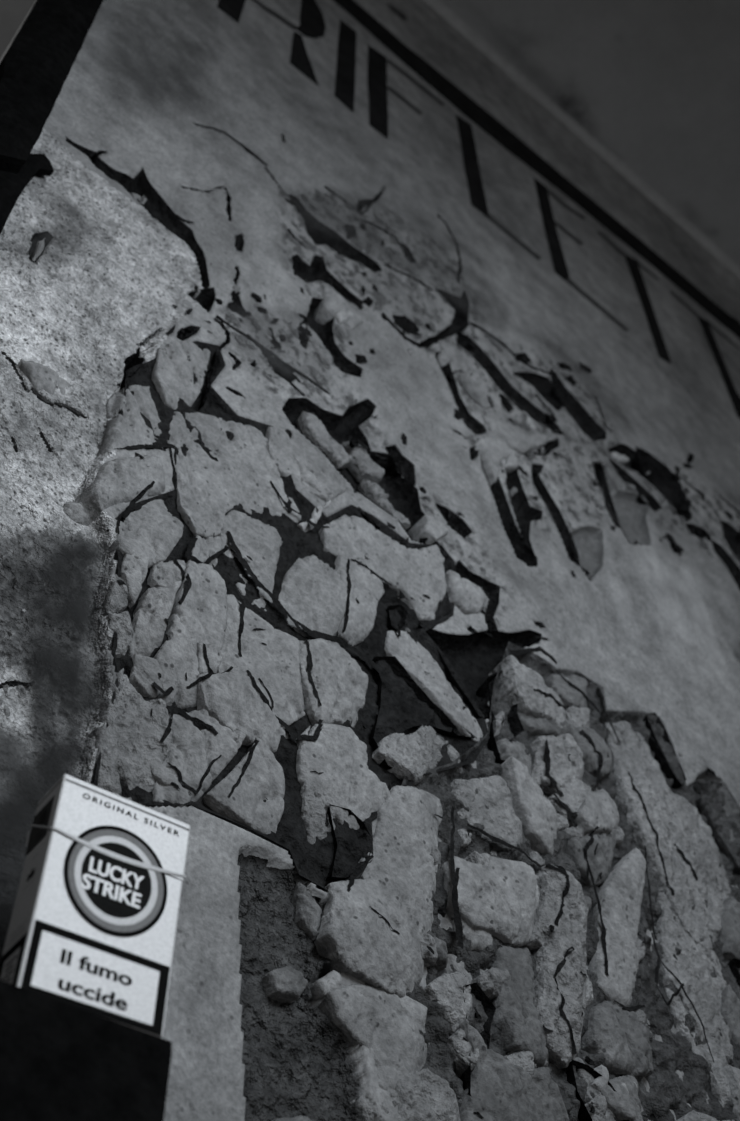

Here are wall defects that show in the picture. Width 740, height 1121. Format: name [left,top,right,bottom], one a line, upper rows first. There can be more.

spalling [29,231,54,263]
spalling [0,527,93,717]
peeling [63,185,740,1121]